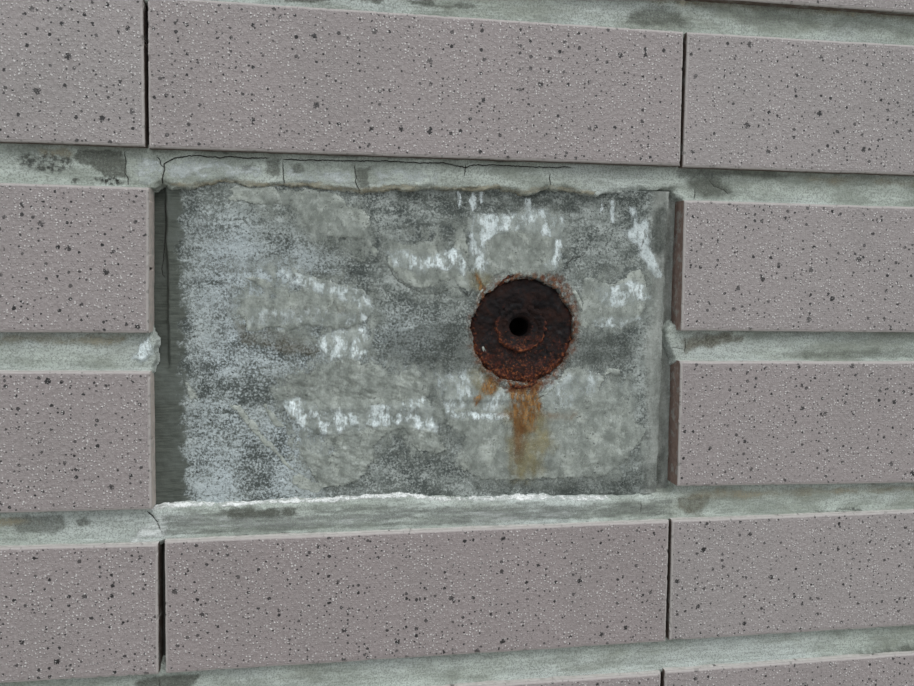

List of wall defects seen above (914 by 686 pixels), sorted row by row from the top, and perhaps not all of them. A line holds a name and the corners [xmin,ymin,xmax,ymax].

peeling [229,185,370,239]
peeling [387,209,566,302]
peeling [572,233,660,328]
peeling [230,268,647,493]
rust [471,274,579,476]